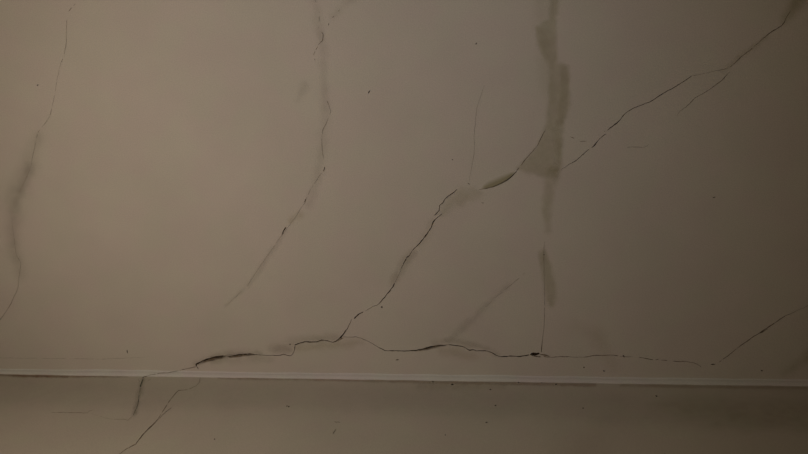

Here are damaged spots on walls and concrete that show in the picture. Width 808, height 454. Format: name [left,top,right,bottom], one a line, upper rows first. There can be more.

crack [561,12,790,170]
crack [53,157,807,454]